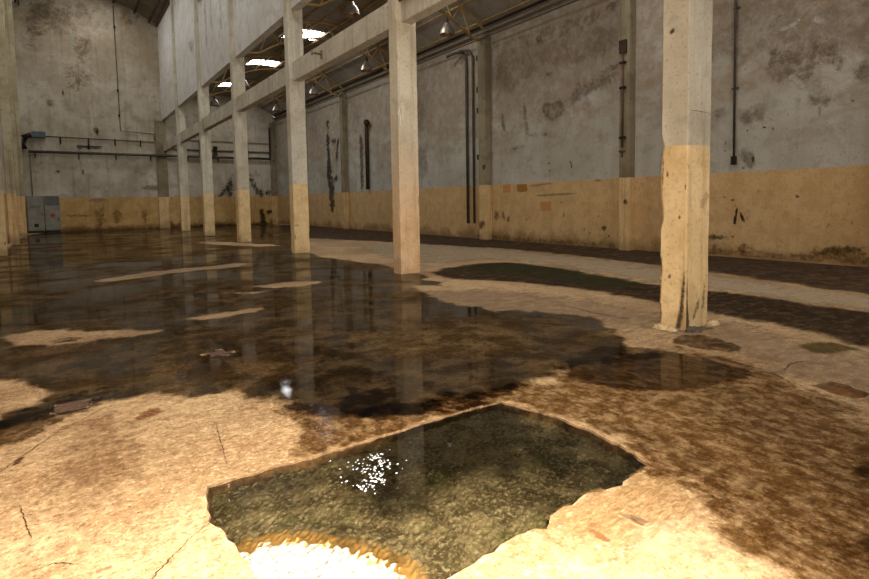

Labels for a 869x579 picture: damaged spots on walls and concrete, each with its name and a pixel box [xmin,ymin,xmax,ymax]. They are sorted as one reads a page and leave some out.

water stain [326,120,339,213]
water stain [792,246,869,264]
spalling [812,381,869,398]
spalling [206,401,692,579]
water stain [288,335,869,579]
crack [151,522,210,579]